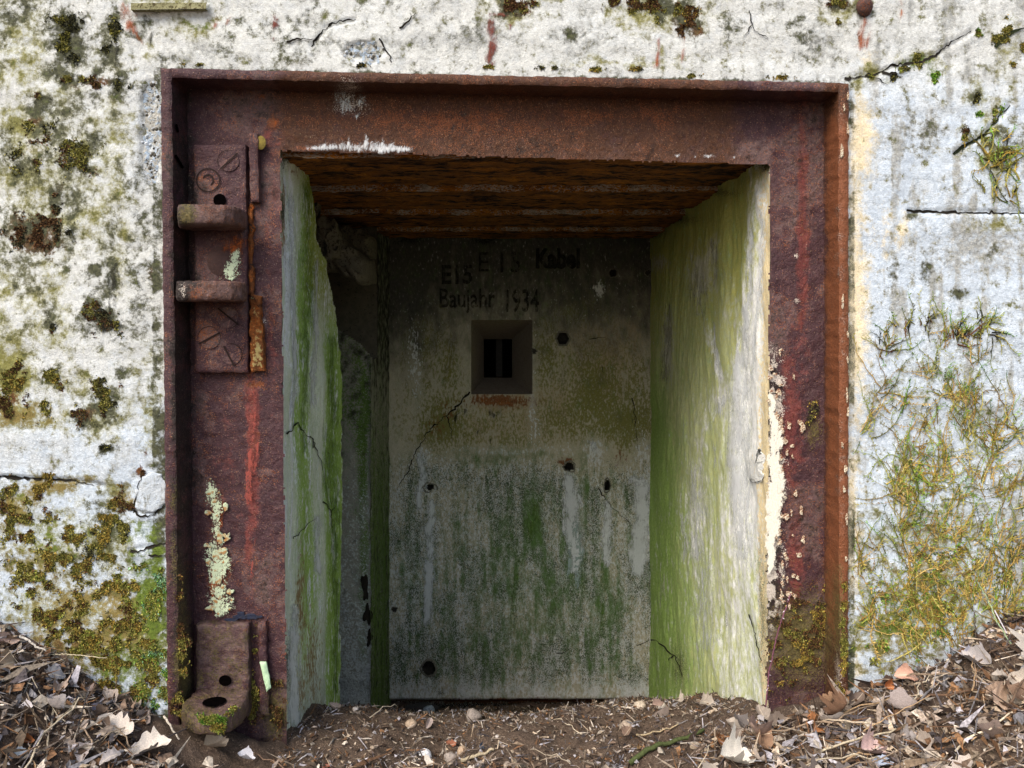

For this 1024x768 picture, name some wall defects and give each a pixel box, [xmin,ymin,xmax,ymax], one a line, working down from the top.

crack [286,19,354,47]
crack [844,31,971,85]
crack [907,207,1024,215]
peeling [766,349,806,473]
crack [0,475,93,485]
crack [115,477,166,518]
damp [415,454,437,625]
damp [562,474,588,602]
damp [595,499,613,567]
damp [628,476,650,577]
peeling [775,490,805,610]
damp [288,606,301,727]